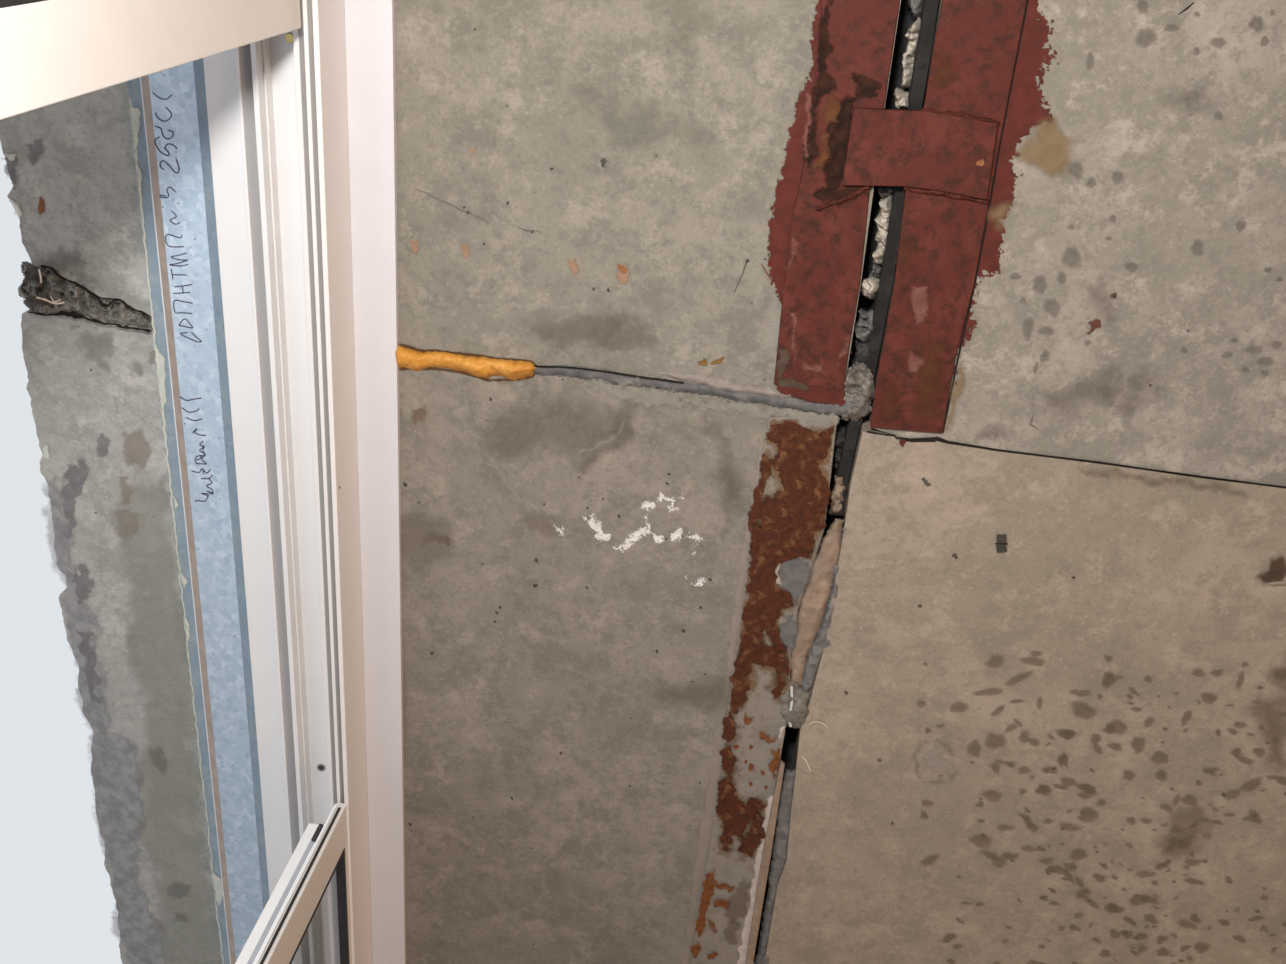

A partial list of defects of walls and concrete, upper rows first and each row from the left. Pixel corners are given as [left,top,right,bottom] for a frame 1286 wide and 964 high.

corrosion [803,3,882,206]
corrosion [1021,123,1068,173]
corrosion [1087,319,1101,334]
leakage [583,491,707,556]
corrosion [716,419,835,860]
leakage [977,651,1042,714]
leakage [1073,656,1120,716]
leakage [969,676,1286,964]
corrosion [690,873,734,959]